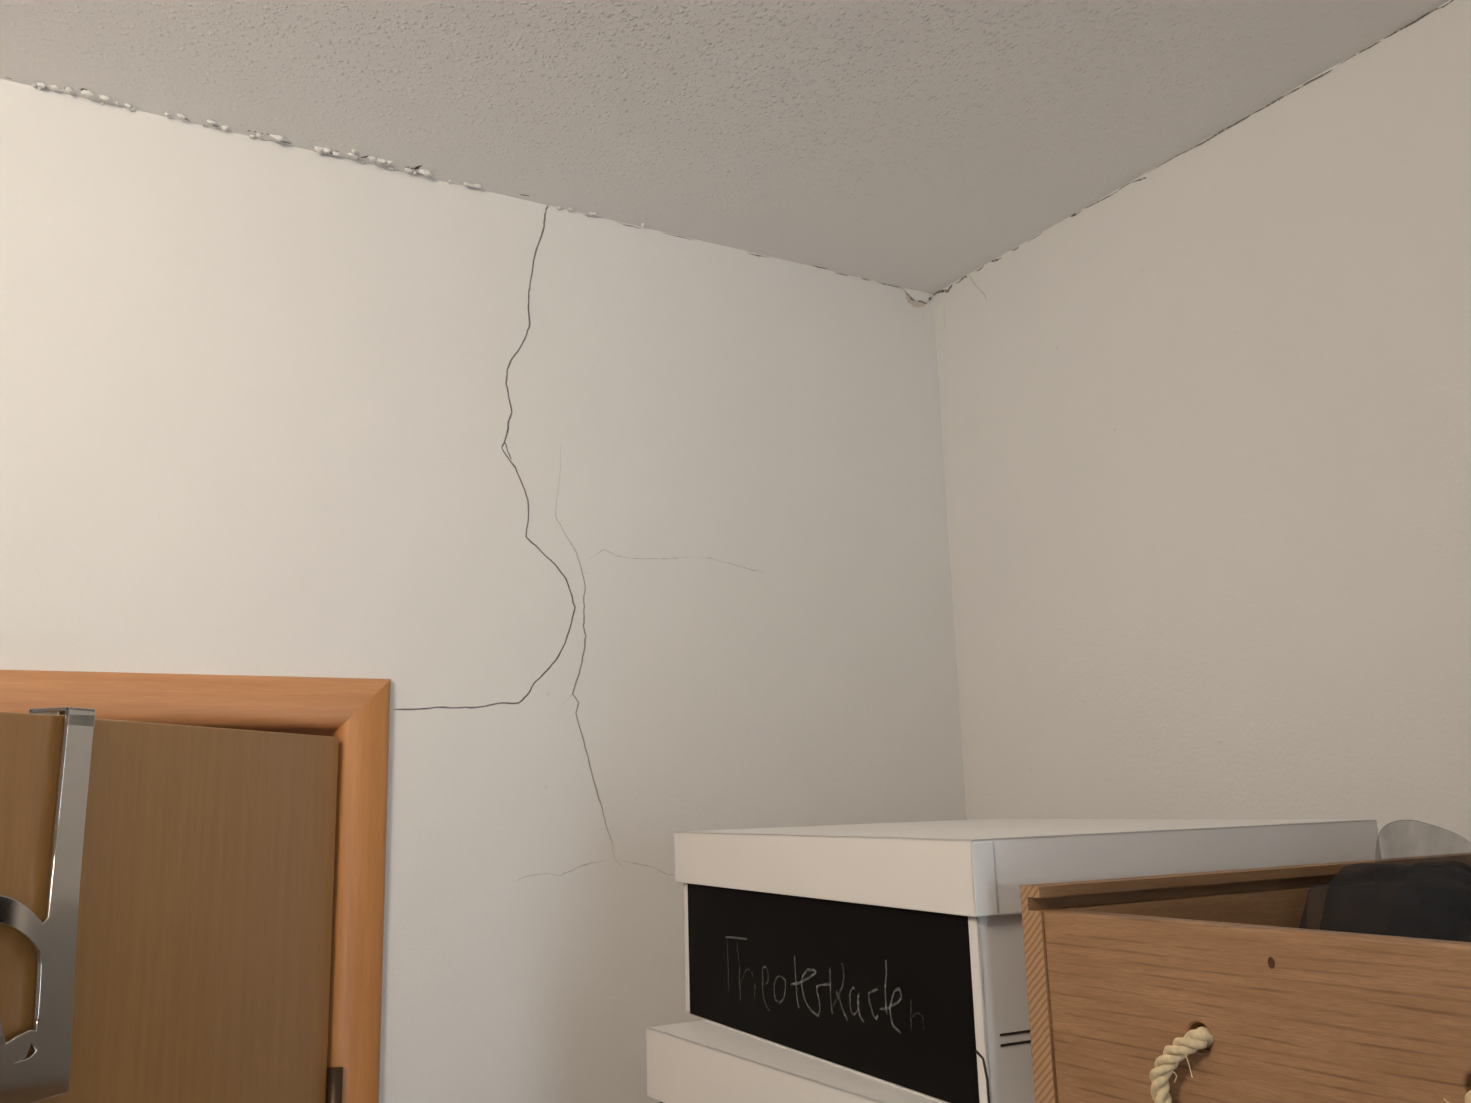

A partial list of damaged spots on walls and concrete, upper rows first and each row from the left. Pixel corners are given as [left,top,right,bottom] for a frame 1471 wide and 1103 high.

crack [934,0,1454,295]
crack [393,205,599,798]